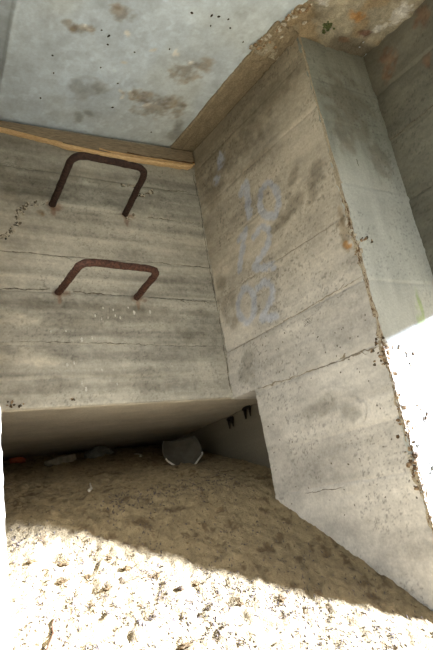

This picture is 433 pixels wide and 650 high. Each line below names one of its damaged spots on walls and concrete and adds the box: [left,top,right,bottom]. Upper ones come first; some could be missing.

spalling [242,0,425,60]
leakage [56,52,220,148]
corrosion [43,199,68,218]
corrosion [50,287,74,307]
spalling [301,47,433,534]